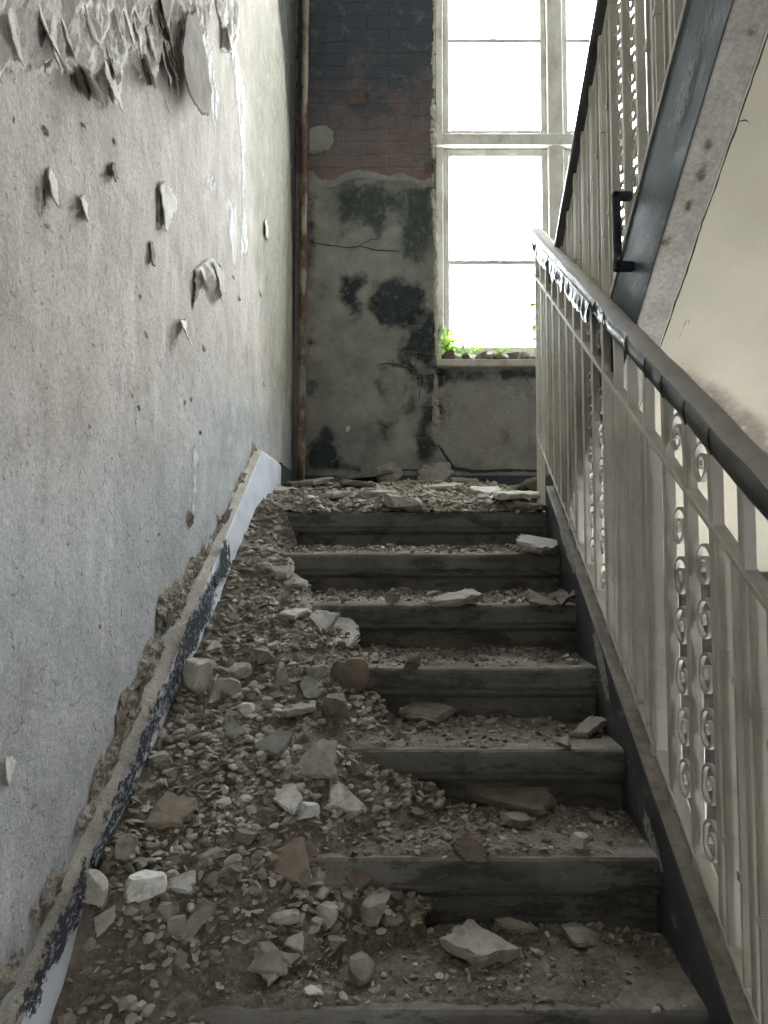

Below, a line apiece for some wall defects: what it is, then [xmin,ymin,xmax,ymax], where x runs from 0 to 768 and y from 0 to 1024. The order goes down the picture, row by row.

peeling [0,0,240,116]
peeling [43,167,60,209]
peeling [79,194,89,222]
peeling [156,181,177,232]
crack [310,238,398,251]
flaking render [296,0,439,356]
mould [337,180,433,262]
peeling [179,257,235,352]
damp [340,276,482,461]
damp [499,370,536,379]
mould [308,428,360,471]
flaking render [0,442,259,1022]